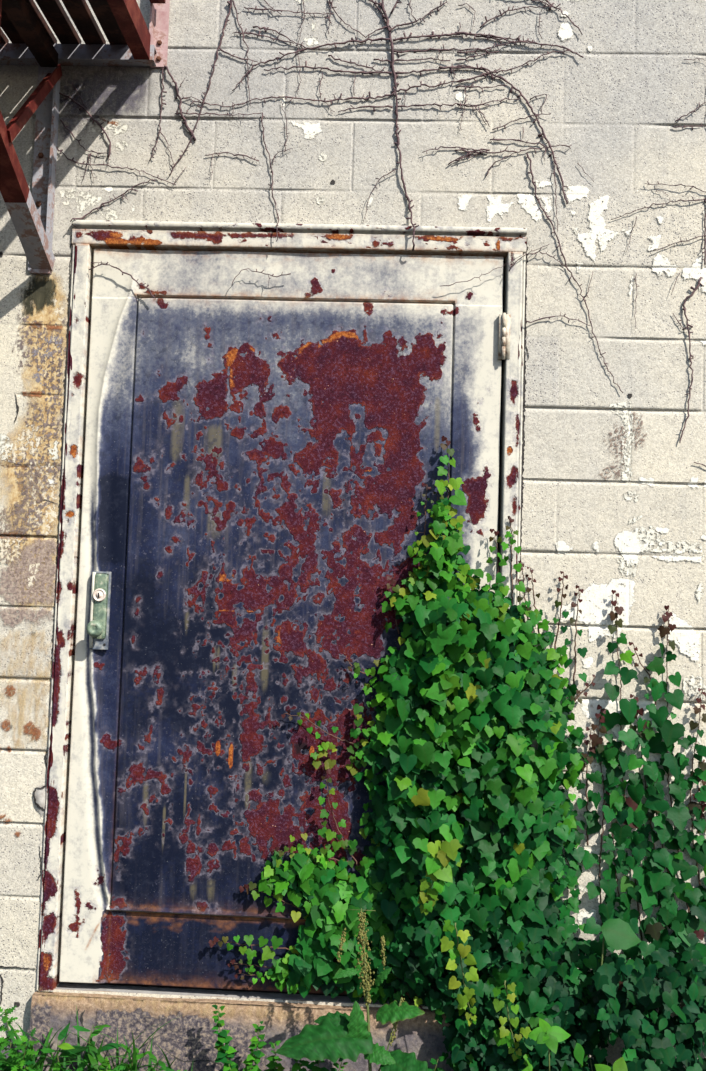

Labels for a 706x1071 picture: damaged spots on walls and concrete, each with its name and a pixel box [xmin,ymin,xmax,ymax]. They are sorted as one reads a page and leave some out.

peeling [458,194,473,210]
peeling [486,180,554,222]
peeling [566,184,634,272]
peeling [648,216,706,292]
damp [21,288,54,315]
peeling [600,394,655,502]
damp [0,539,57,627]
peeling [554,540,573,554]
peeling [558,514,706,642]
peeling [581,656,594,668]
peeling [668,612,706,700]
corrosion [23,721,41,740]